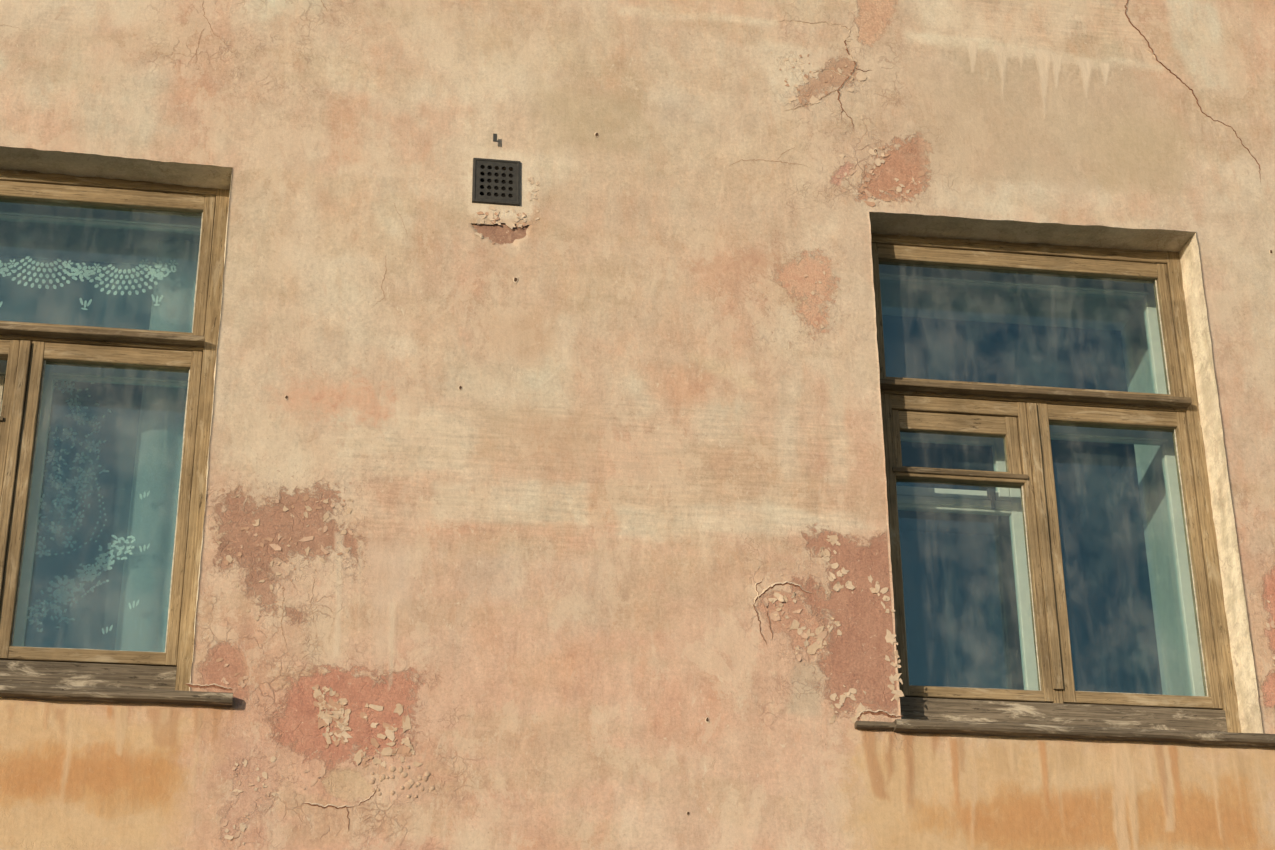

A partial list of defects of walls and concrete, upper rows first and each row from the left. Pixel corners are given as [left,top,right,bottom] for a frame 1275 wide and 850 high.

flaking render [472,211,528,245]
peeling [770,50,868,114]
crack [780,20,869,128]
peeling [824,143,925,209]
damp [866,26,1217,224]
crack [1125,0,1261,182]
peeling [205,475,367,634]
peeling [746,517,904,724]
rust [0,697,216,850]
peeling [194,633,435,811]
rust [824,707,1275,850]